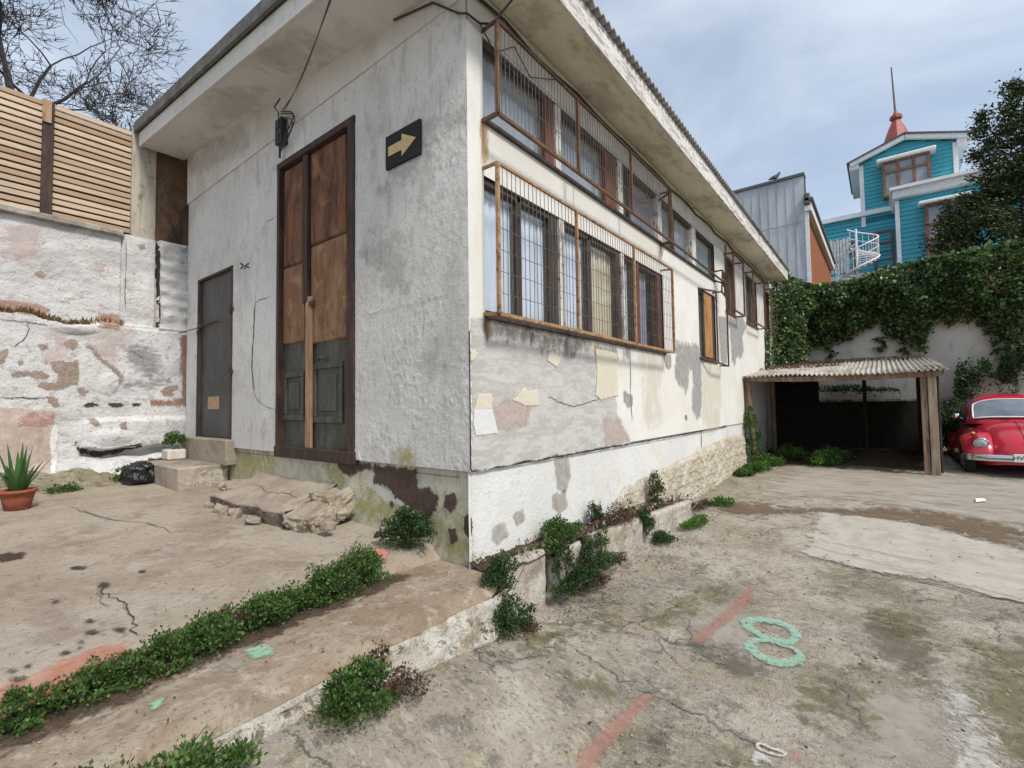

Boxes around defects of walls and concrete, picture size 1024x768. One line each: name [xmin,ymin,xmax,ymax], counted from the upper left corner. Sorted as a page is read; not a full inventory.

corrosion [480,121,489,164]
spalling [0,299,50,316]
peeling [98,313,124,329]
peeling [0,339,89,474]
spalling [108,385,186,407]
flaking render [470,318,631,512]
peeling [337,449,473,544]
crack [73,507,171,533]
spalling [492,509,525,543]
crack [96,586,145,638]